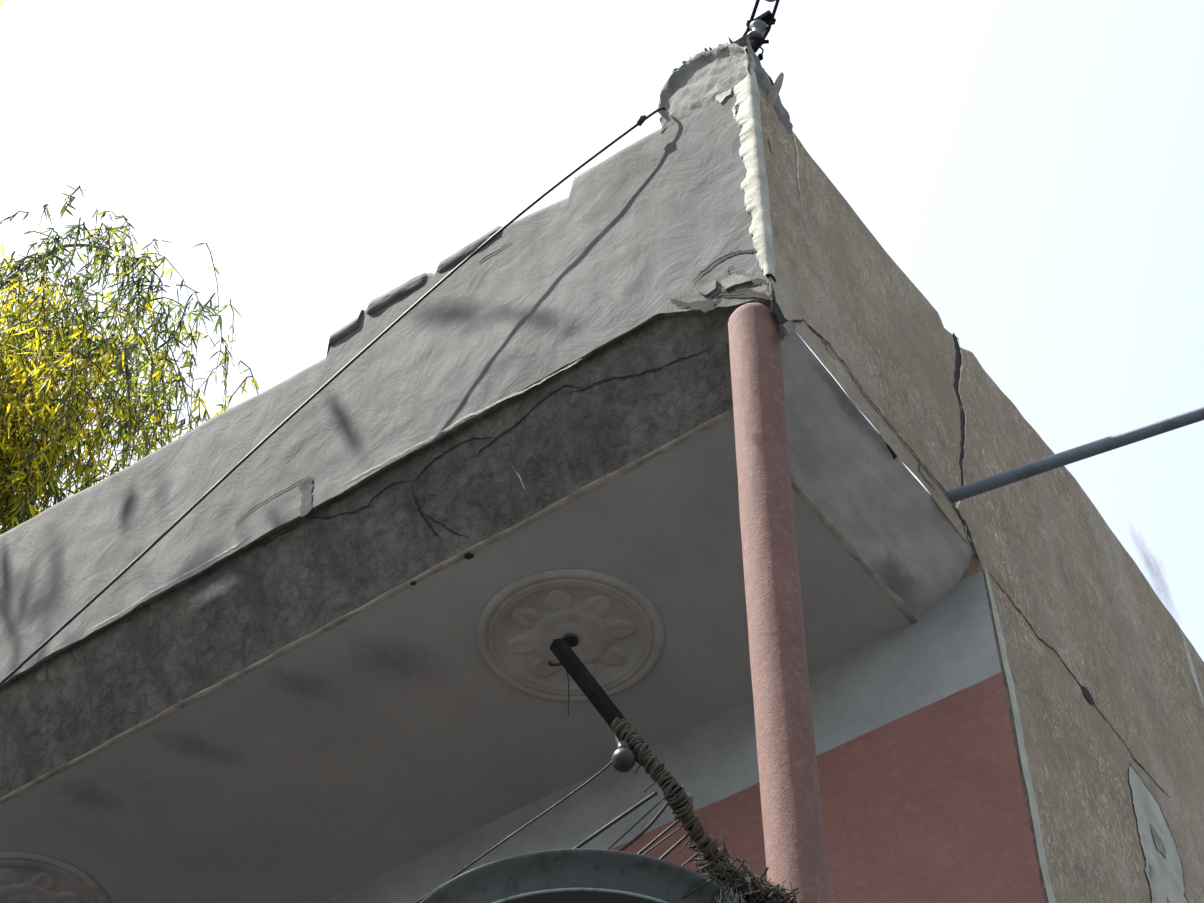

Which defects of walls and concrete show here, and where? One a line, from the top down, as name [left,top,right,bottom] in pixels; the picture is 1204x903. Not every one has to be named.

spalling [658,34,797,341]
crack [233,476,310,525]
crack [262,350,709,546]
crack [670,249,967,502]
crack [989,572,1169,796]
peeling [1129,762,1189,903]